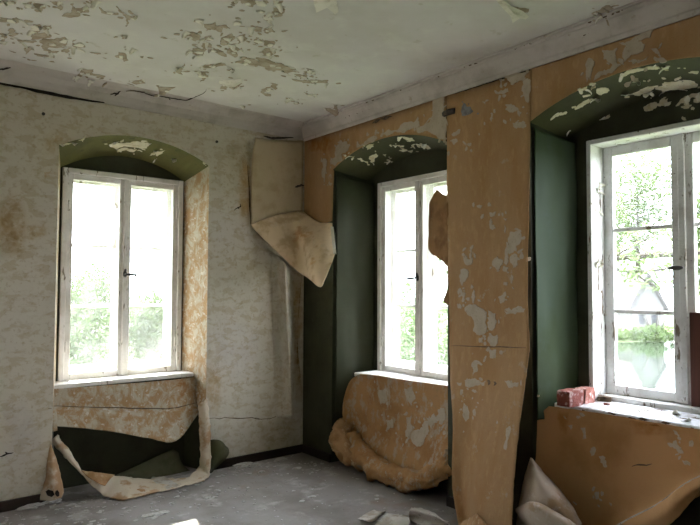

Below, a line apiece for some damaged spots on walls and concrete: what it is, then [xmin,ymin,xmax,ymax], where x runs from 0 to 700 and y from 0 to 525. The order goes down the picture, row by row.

peeling [0,0,153,63]
crack [0,67,206,103]
peeling [161,0,341,105]
peeling [484,70,531,129]
peeling [550,29,700,120]
peeling [105,139,164,163]
peeling [321,96,472,186]
peeling [472,202,531,314]
peeling [457,245,503,421]
spalling [564,386,618,429]
peeling [628,409,700,466]
peeling [151,476,181,489]